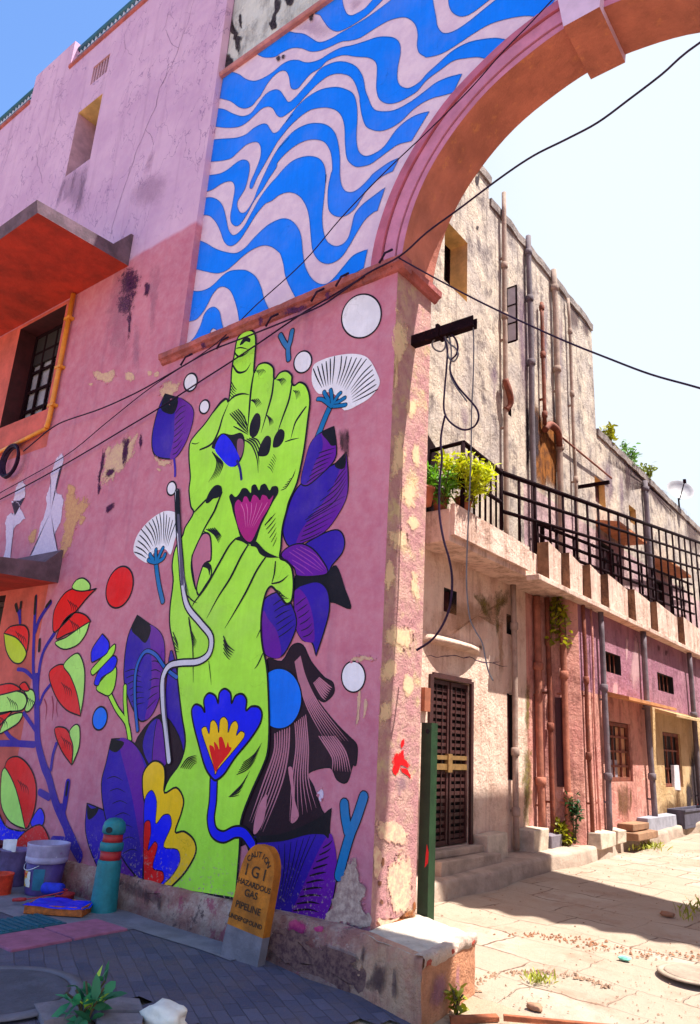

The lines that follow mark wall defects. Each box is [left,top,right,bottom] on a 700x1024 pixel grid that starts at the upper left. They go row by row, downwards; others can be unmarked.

mould [117,269,150,338]
peeling [89,369,135,386]
peeling [392,305,410,388]
peeling [391,399,419,419]
peeling [98,429,142,489]
corrosion [535,411,557,485]
peeling [60,484,90,561]
peeling [385,432,420,590]
peeling [411,571,420,600]
peeling [350,625,415,697]
peeling [325,820,414,929]